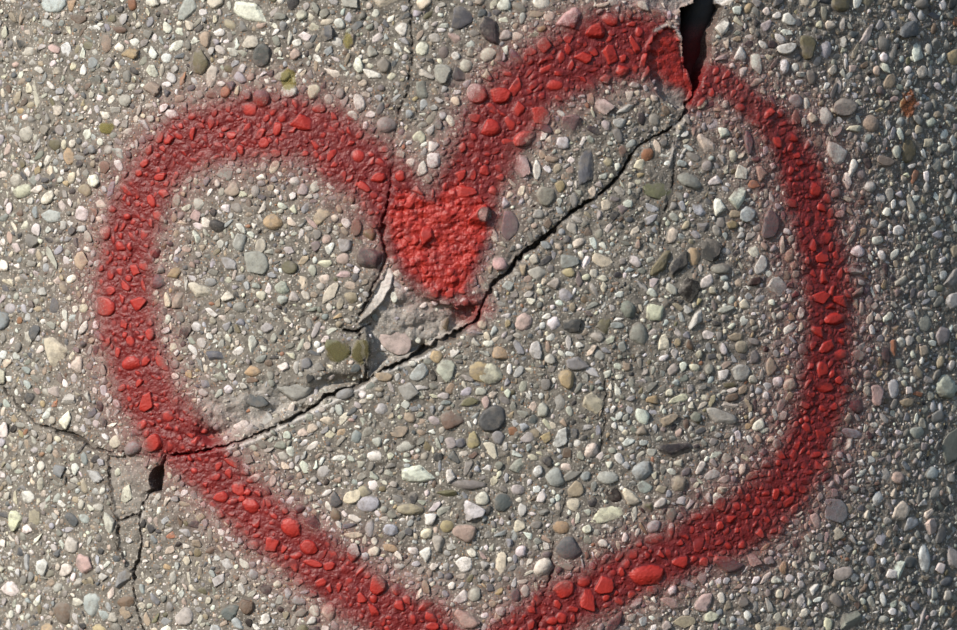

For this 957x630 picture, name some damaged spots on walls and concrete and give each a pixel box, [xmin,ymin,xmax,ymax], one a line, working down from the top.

spalling [617,0,693,15]
spalling [652,75,691,110]
crack [3,0,724,630]